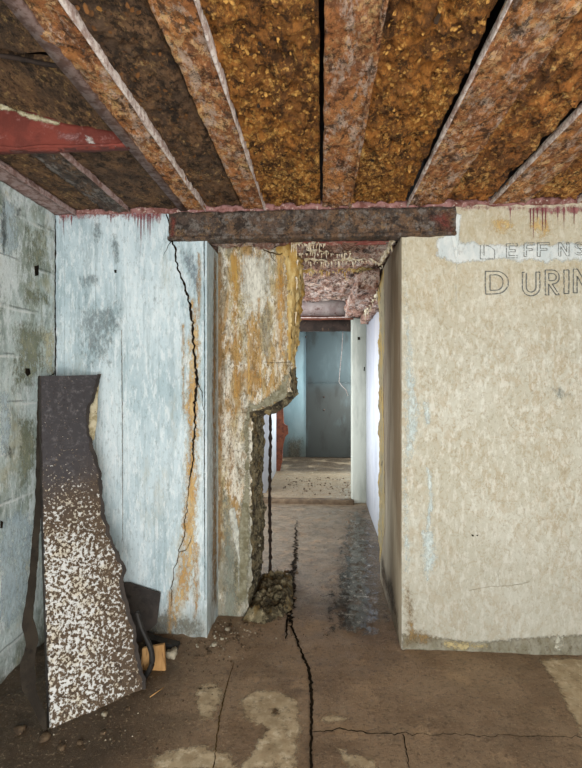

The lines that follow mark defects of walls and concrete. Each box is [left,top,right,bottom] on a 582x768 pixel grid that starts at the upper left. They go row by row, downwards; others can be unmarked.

crack [163,213,205,605]
rust [169,254,201,634]
crack [212,664,234,768]
rust [212,253,265,604]
spalling [233,374,294,605]
rust [275,254,288,356]
water stain [241,240,582,655]
crack [285,520,582,768]